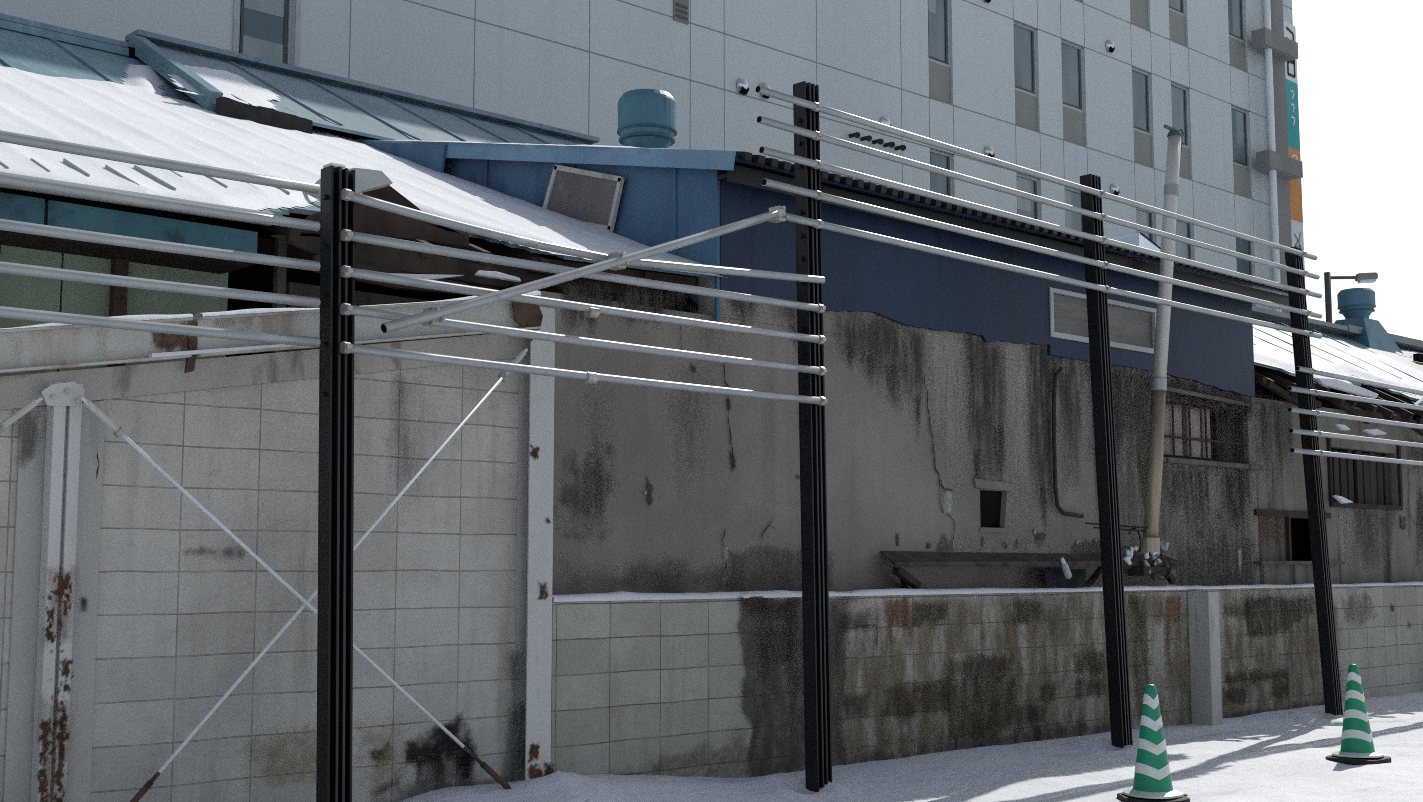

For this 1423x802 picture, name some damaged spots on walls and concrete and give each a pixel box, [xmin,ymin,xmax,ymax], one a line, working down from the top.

damp [846,320,922,419]
crack [924,376,956,539]
damp [966,333,1003,473]
damp [1030,345,1094,515]
damp [1112,370,1289,499]
rust [37,573,74,802]
damp [371,710,520,802]
rust [528,743,554,779]
damp [733,559,805,777]
damp [829,596,1111,766]
damp [1125,594,1191,726]